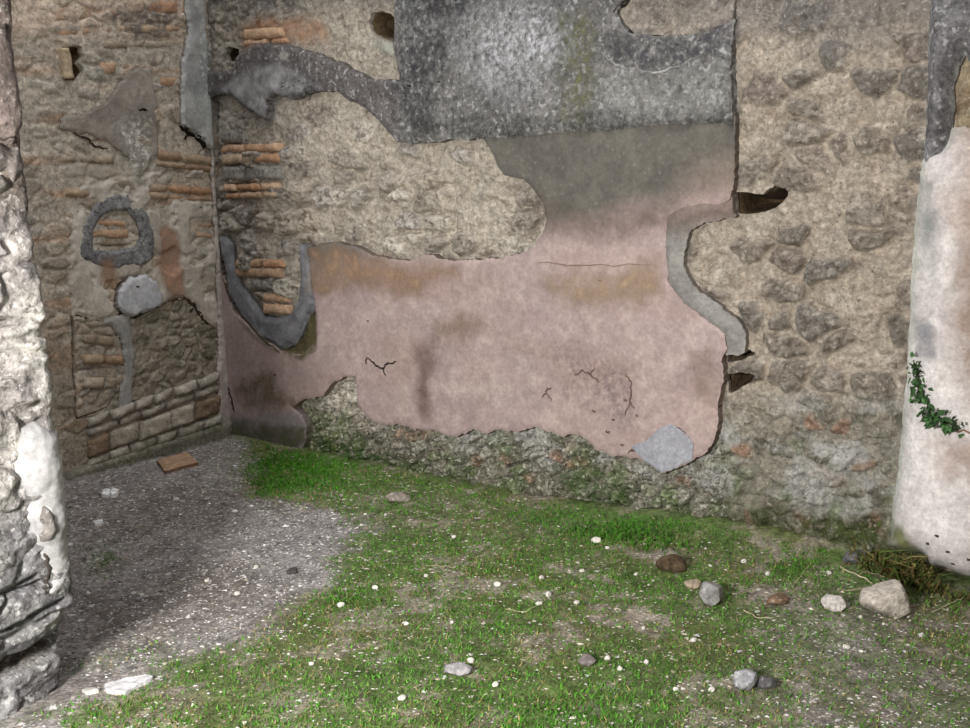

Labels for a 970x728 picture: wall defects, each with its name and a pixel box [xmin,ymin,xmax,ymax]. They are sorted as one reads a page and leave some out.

spalling [57,47,80,81]
spalling [55,0,184,49]
spalling [206,0,411,87]
spalling [954,57,970,128]
crack [73,133,108,149]
crack [179,126,206,149]
spalling [149,92,546,317]
crack [538,260,644,268]
spalling [301,0,931,557]
crack [365,357,397,376]
crack [574,368,599,383]
crack [625,375,635,416]